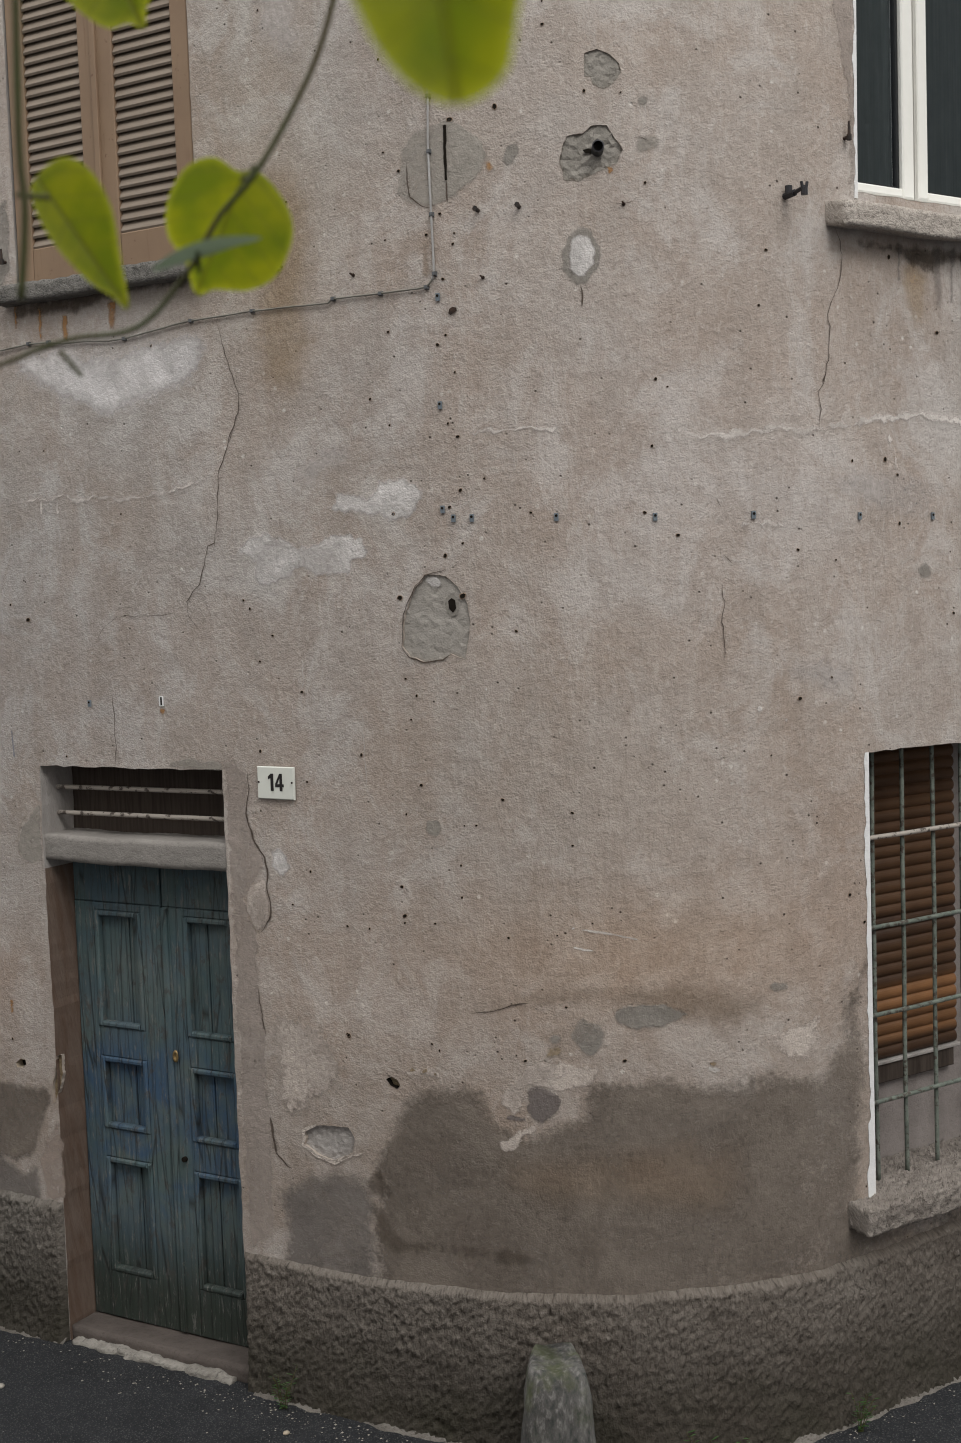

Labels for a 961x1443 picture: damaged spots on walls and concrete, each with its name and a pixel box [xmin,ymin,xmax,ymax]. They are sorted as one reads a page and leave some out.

corrosion [14,293,115,339]
crack [819,228,842,423]
crack [97,321,239,639]
crack [245,775,272,932]
damp [0,1082,50,1198]
damp [284,988,957,1295]